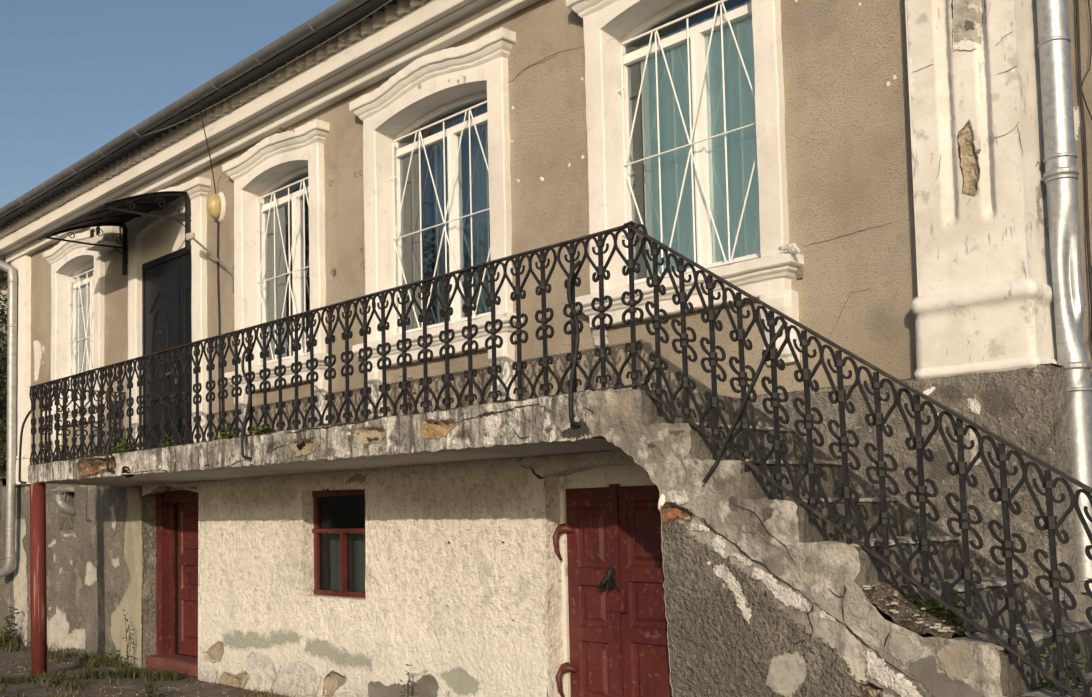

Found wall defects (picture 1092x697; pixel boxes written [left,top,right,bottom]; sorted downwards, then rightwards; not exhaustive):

spalling [952,0,982,51]
crack [510,47,581,82]
spalling [957,120,982,196]
spalling [290,437,315,458]
spalling [332,427,386,458]
spalling [419,418,458,439]
peeling [84,562,98,586]
peeling [658,489,836,624]
crack [689,501,913,680]
peeling [47,606,86,651]
peeling [203,641,361,697]
peeling [843,604,925,697]